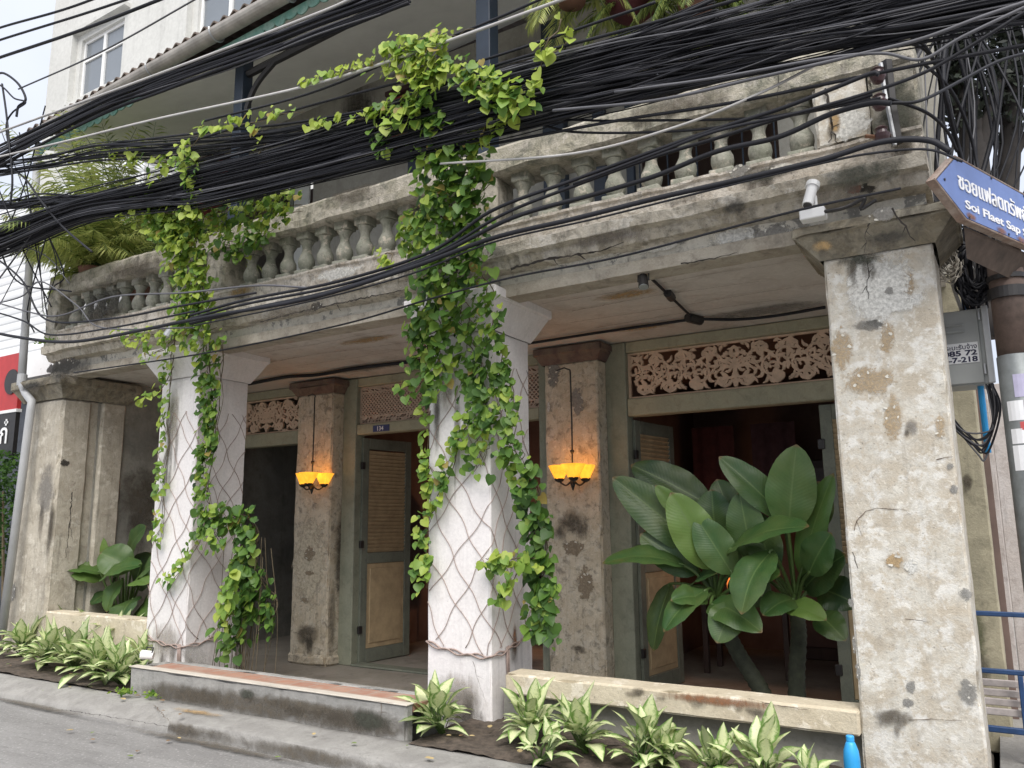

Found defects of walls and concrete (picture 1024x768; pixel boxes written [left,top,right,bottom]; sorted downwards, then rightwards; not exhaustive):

crack [891,208,915,241]
crack [510,242,624,271]
damp [845,249,876,267]
crack [862,223,873,299]
peeling [831,253,922,439]
crack [65,492,73,556]
damp [561,514,584,533]
crack [852,508,911,568]
damp [298,627,316,645]
damp [879,710,911,732]